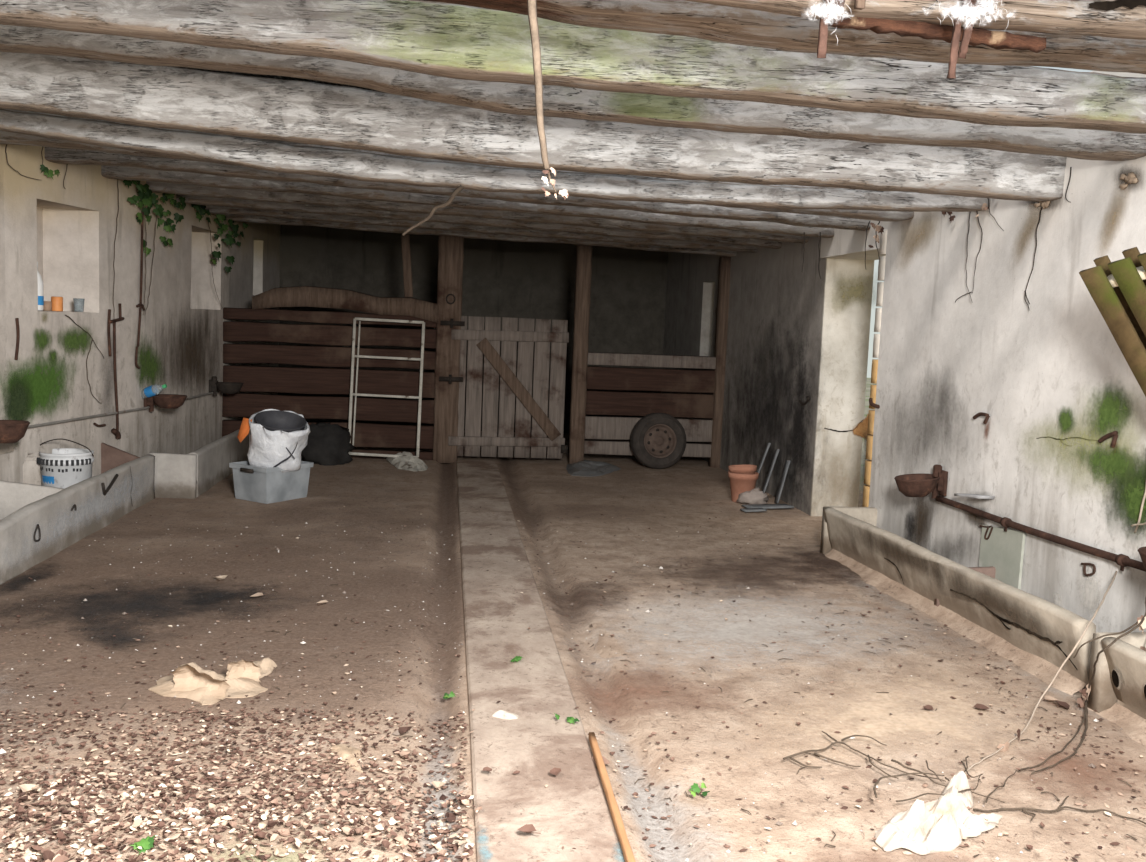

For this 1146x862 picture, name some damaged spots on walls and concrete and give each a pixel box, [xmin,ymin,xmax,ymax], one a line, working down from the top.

crack [1089,0,1146,11]
water stain [6,379,30,421]
crack [980,604,1078,670]